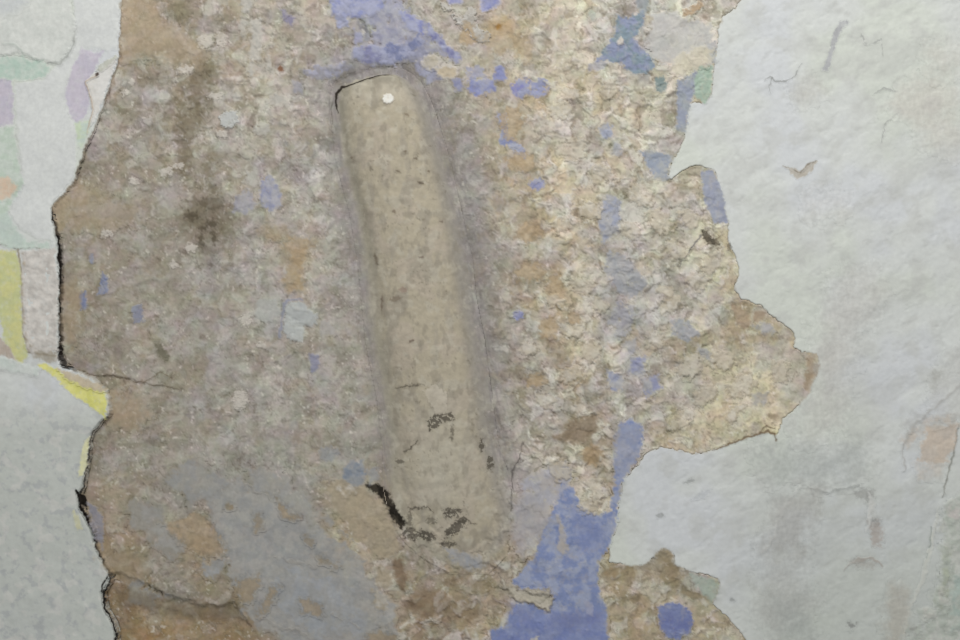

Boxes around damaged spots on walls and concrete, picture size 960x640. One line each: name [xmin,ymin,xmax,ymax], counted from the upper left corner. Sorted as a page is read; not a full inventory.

spalling [688,0,741,39]
crack [330,74,390,125]
peeling [0,0,120,364]
crack [51,18,183,392]
peeling [642,327,667,353]
peeling [395,382,458,442]
peeling [547,456,576,484]
peeling [575,472,607,516]
peeling [402,505,440,543]
peeling [439,506,488,573]
spalling [600,546,705,603]
spalling [598,567,745,640]